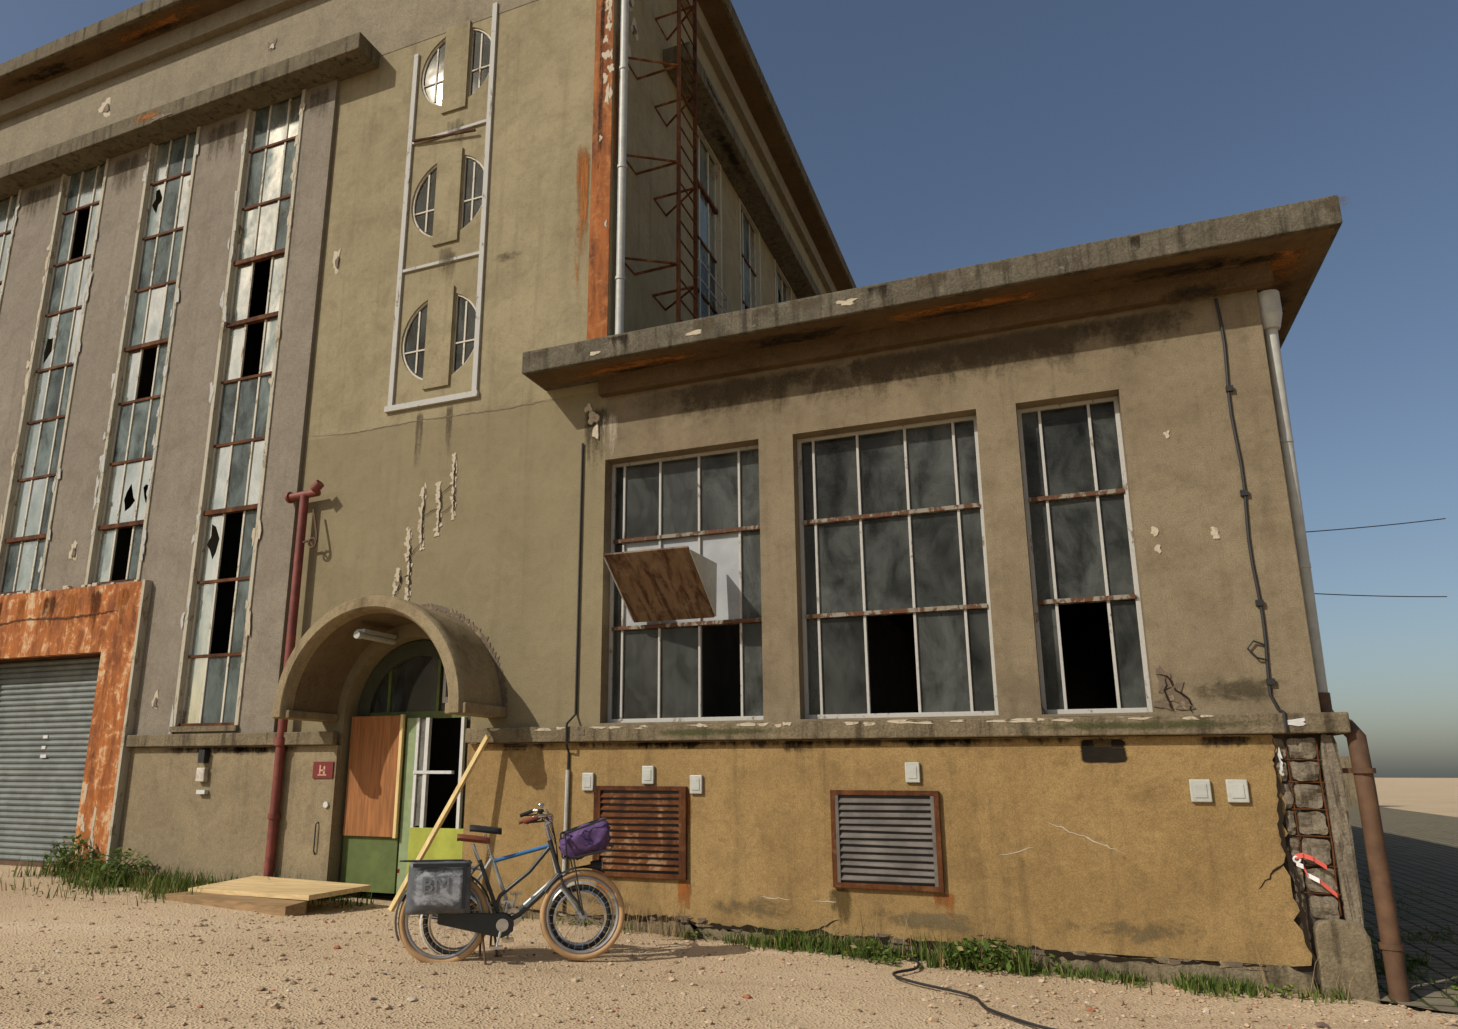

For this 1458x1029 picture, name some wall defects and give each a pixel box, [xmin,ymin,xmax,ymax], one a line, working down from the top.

peeling [602,0,639,104]
corrosion [138,112,173,123]
corrosion [575,0,619,340]
water stain [673,250,1305,410]
water stain [575,335,690,377]
flaking render [1151,526,1162,554]
corrosion [0,589,128,627]